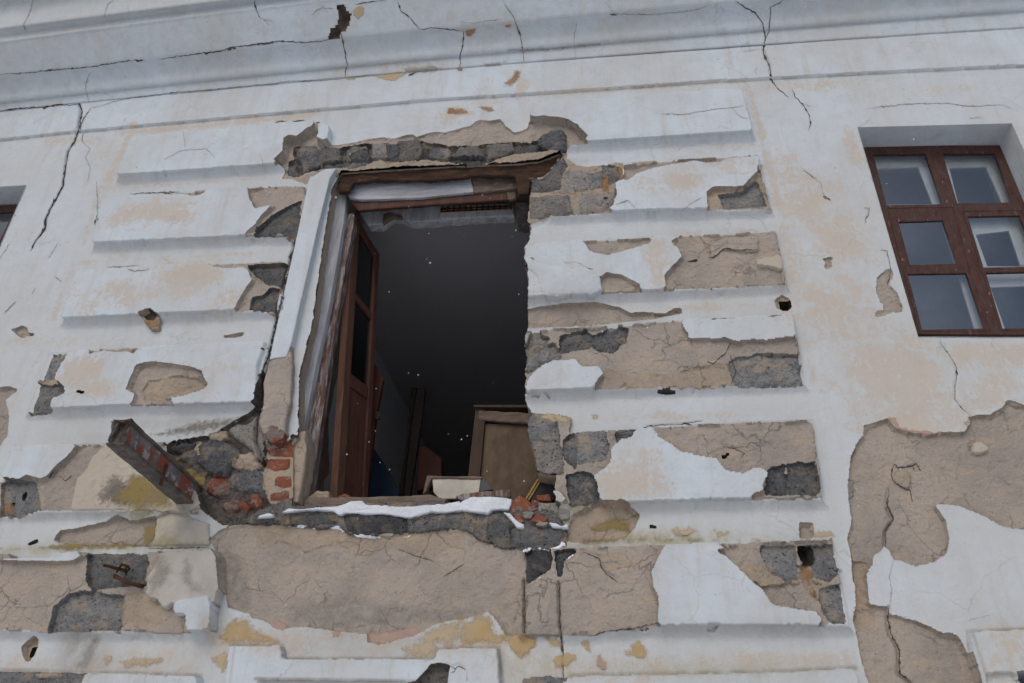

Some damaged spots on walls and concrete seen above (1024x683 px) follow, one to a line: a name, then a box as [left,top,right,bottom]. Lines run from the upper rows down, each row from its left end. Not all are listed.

crack [311,0,524,66]
crack [736,0,812,131]
crack [0,1,372,313]
spalling [245,115,770,245]
peeling [89,348,208,407]
spalling [209,261,291,318]
spalling [524,272,803,395]
peeling [664,231,785,292]
spalling [652,420,822,501]
corrosion [113,574,146,588]
peeling [0,411,666,643]
peeling [718,400,1024,683]